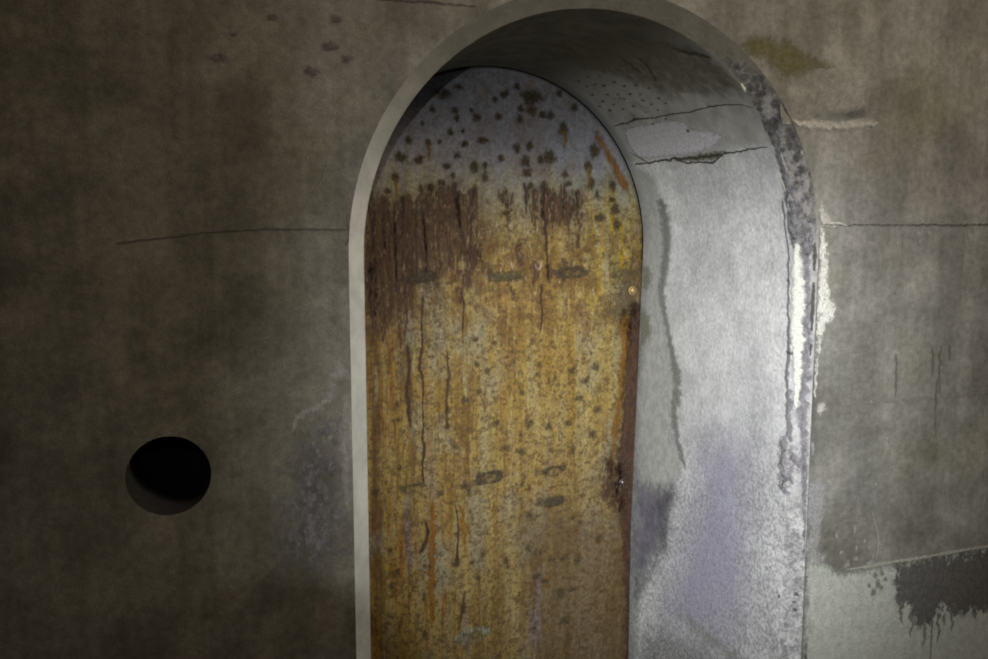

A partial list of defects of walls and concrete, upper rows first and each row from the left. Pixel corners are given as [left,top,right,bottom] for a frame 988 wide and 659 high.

rust [493,83,568,147]
crack [615,104,753,126]
crack [629,147,766,165]
rust [365,84,493,483]
rust [499,131,628,333]
rust [601,257,650,659]
rust [408,491,444,640]
rust [455,506,484,566]
water stain [803,549,988,659]